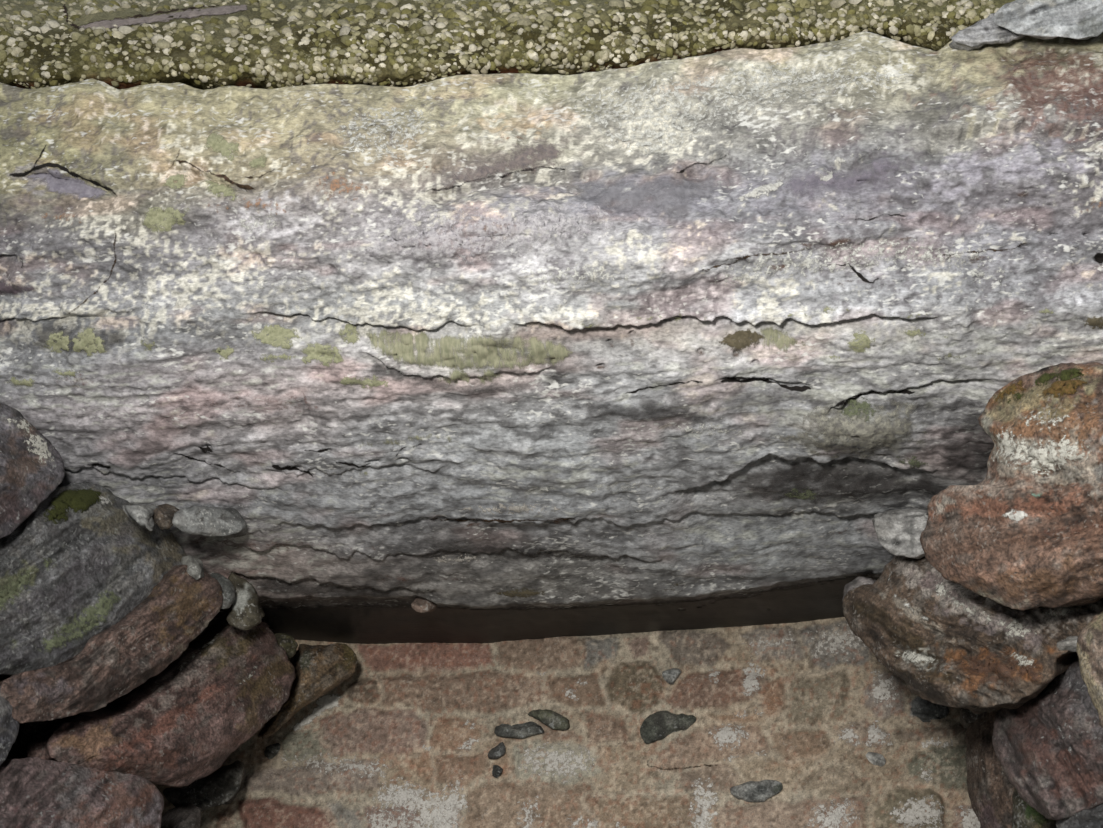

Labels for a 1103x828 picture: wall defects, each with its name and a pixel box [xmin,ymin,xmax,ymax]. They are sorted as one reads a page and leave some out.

crack [10,145,115,194]
crack [627,377,811,393]
crack [833,389,914,408]